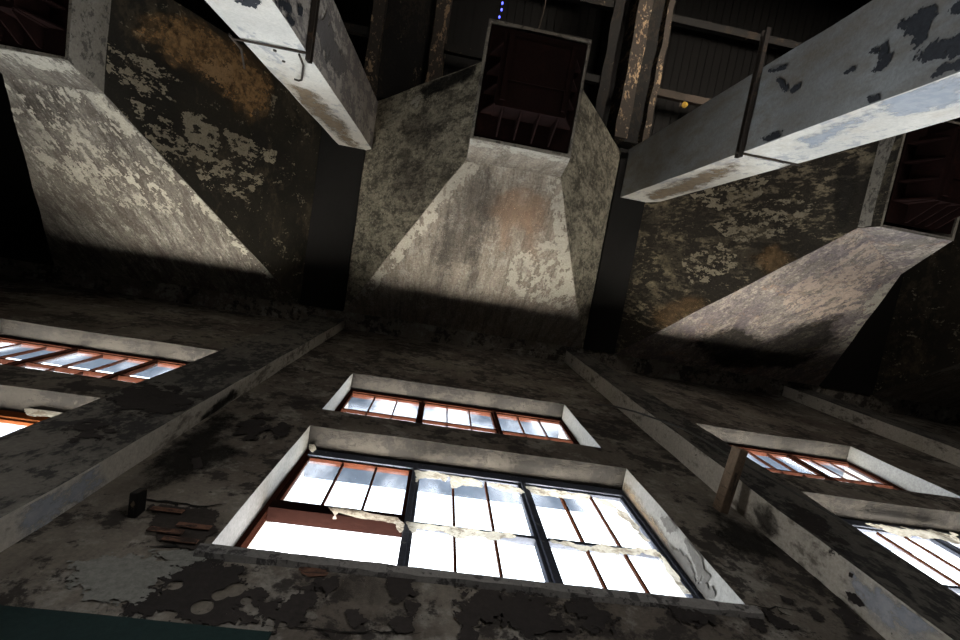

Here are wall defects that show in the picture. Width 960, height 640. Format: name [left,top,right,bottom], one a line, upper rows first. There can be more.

corrosion [137,13,273,119]
peeling [768,64,801,94]
peeling [868,40,894,73]
peeling [897,1,960,79]
peeling [0,46,277,279]
peeling [762,130,783,142]
spalling [65,502,328,634]
spalling [385,576,421,633]
spalling [452,583,622,640]